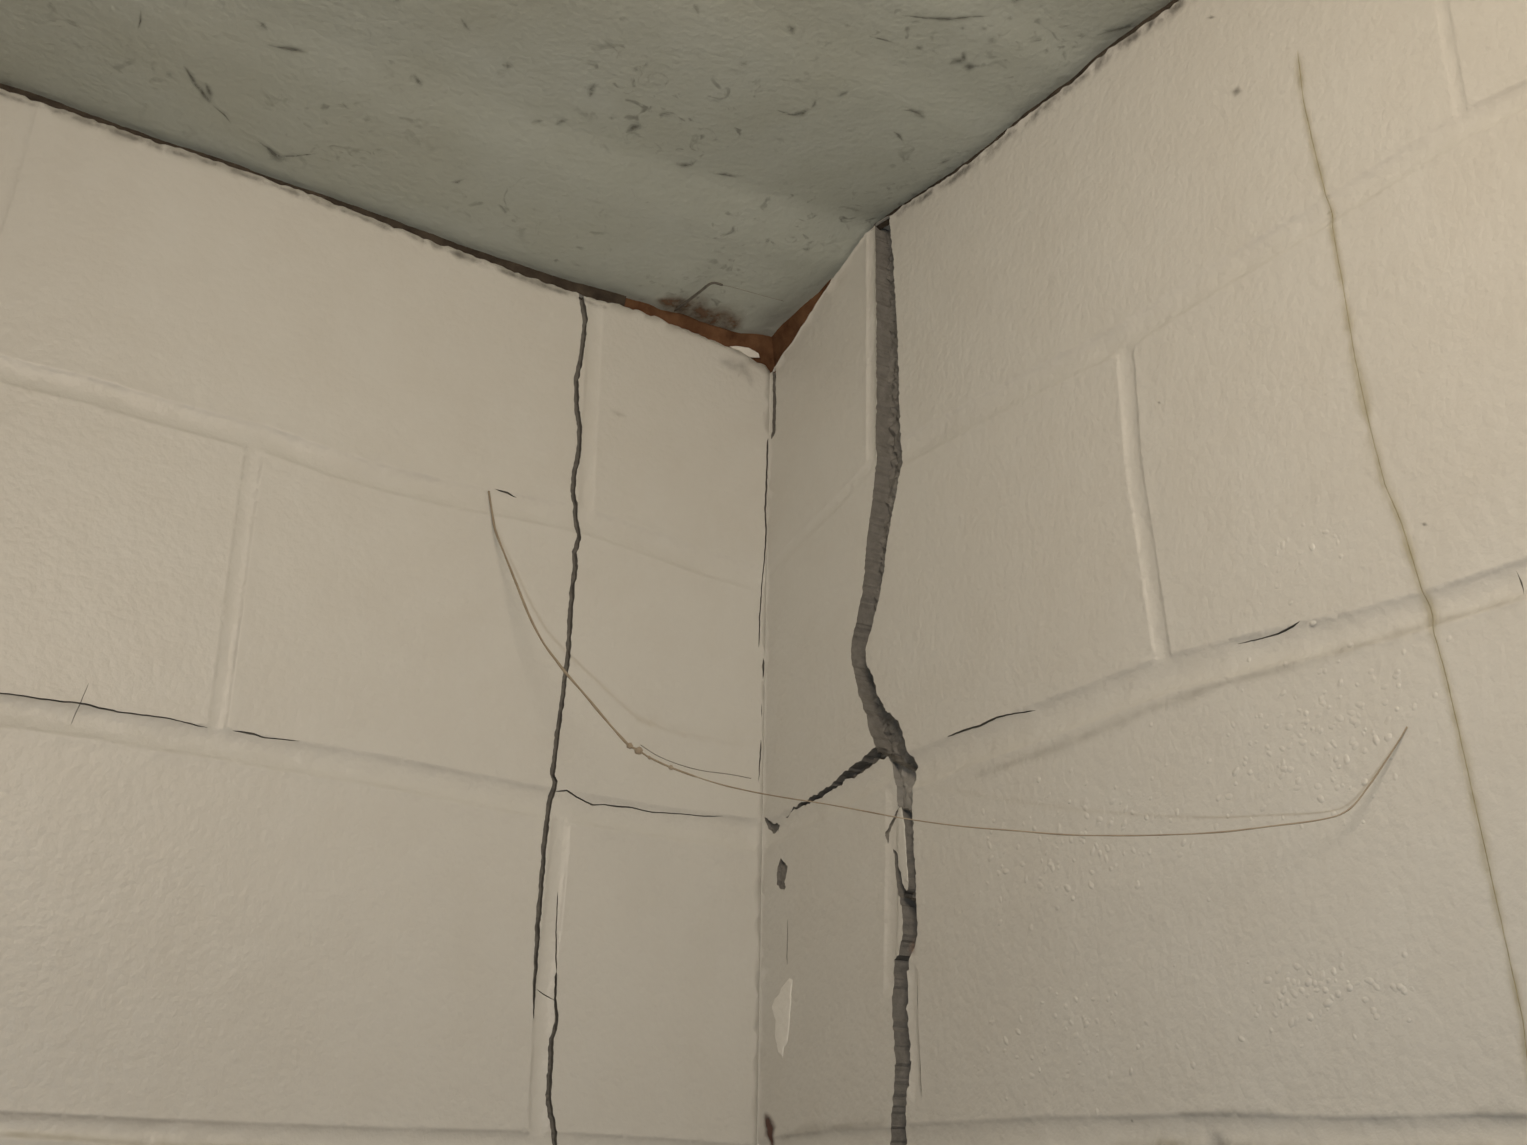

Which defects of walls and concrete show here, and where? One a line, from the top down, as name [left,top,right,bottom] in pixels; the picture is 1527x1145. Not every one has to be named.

crack [533,296,717,1145]
crack [759,369,776,776]
peeling [772,978,793,1058]
crack [786,225,922,1145]